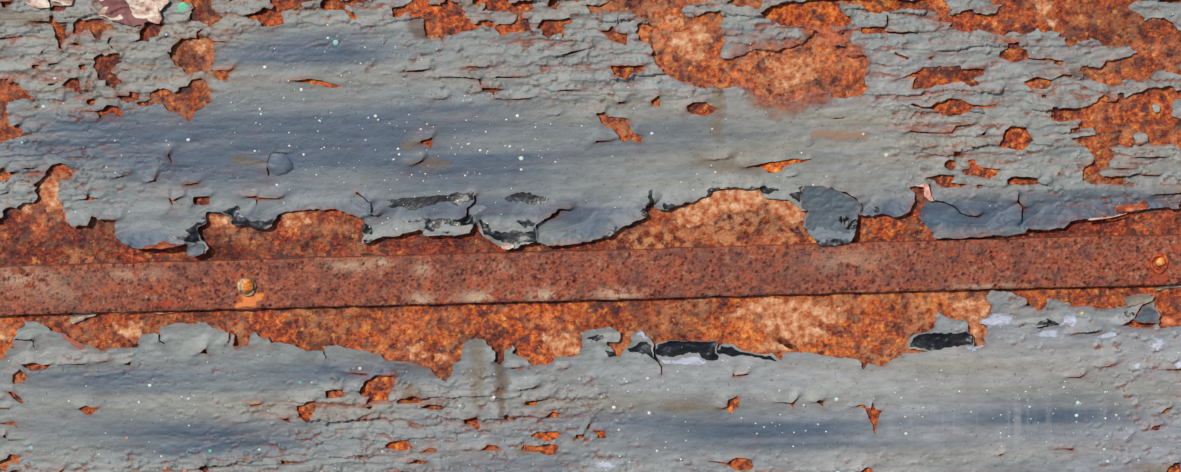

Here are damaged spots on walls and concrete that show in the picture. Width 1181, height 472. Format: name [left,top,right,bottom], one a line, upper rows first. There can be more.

rust [0,78,33,141]
rust [52,18,122,90]
rust [85,105,122,118]
rust [135,0,231,121]
rust [586,0,1181,185]
rust [0,163,816,267]
peeling [792,176,862,246]
rust [851,159,1001,242]
peeling [1007,176,1038,185]
rust [967,200,1181,239]
rust [0,270,1181,409]
rust [707,458,753,470]